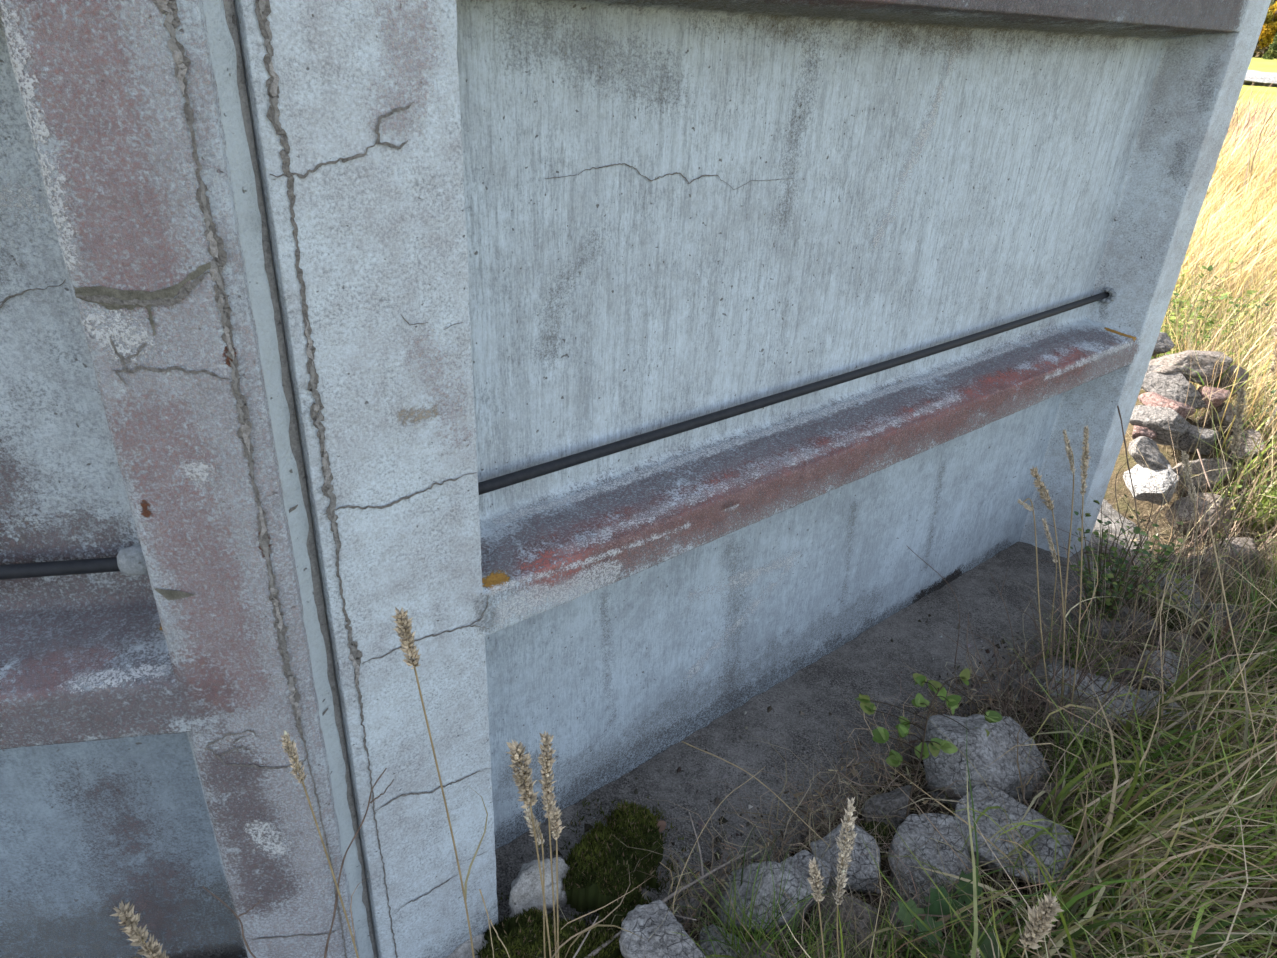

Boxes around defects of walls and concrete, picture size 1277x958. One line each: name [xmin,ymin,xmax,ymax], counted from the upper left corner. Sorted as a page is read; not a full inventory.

crack [270,102,415,179]
crack [545,163,792,190]
crack [0,279,66,308]
crack [109,336,230,387]
crack [289,472,476,515]
corrosion [116,395,266,706]
crack [363,596,489,664]
crack [205,730,309,770]
crack [373,768,491,812]
crack [397,851,487,912]
crack [251,926,343,941]